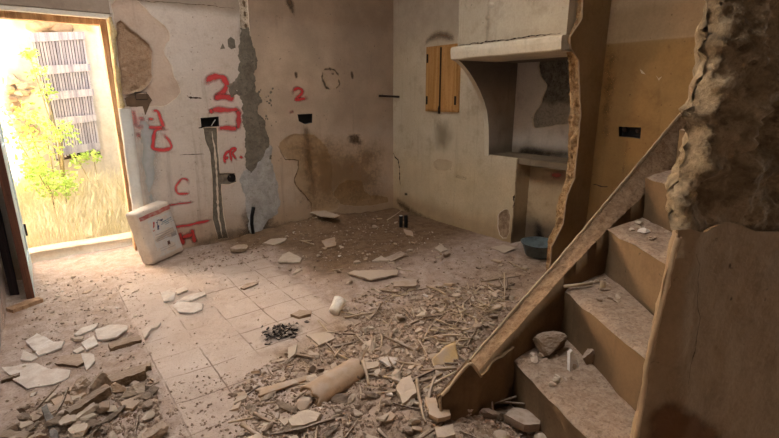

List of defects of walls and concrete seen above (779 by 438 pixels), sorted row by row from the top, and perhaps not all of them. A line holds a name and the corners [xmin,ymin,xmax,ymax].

flaking render [111,0,181,108]
spalling [532,0,583,271]